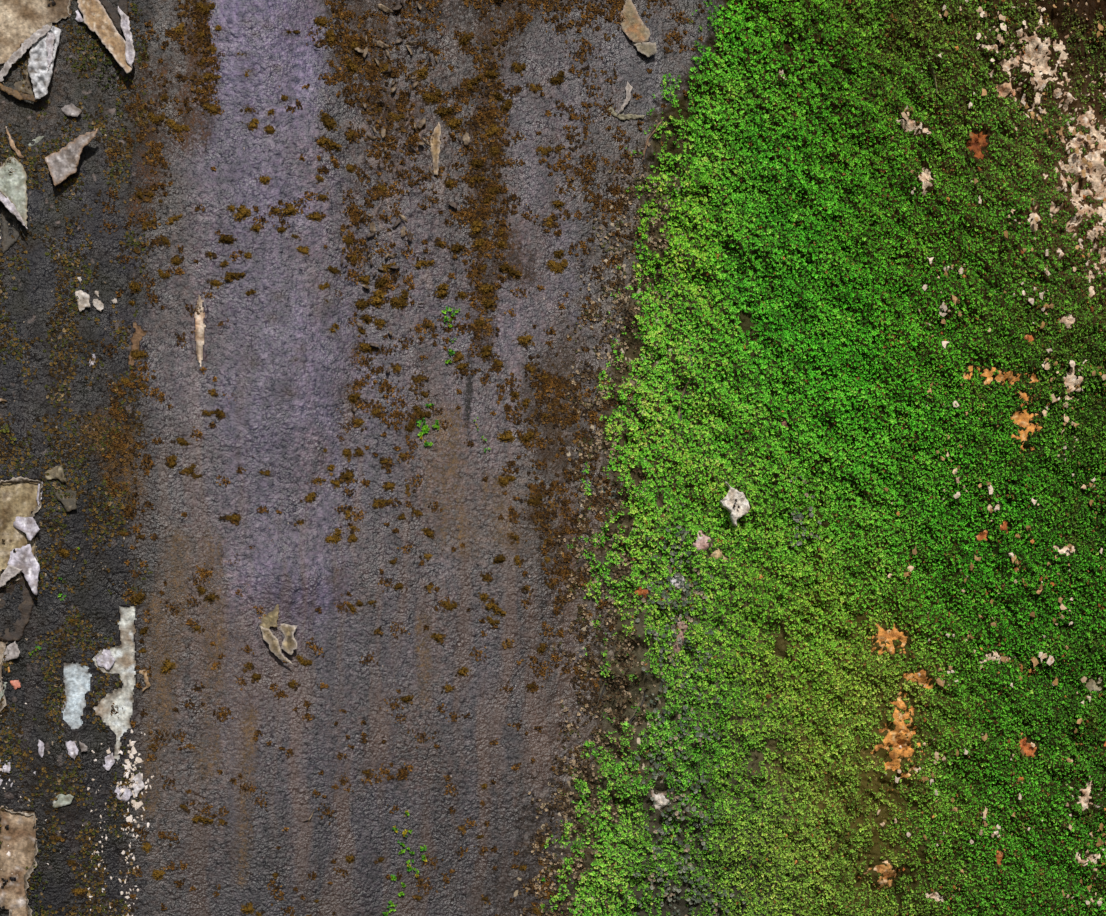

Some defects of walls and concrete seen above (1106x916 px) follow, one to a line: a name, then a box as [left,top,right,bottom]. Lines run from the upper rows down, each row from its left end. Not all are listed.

peeling [0,0,135,102]
peeling [0,126,44,254]
peeling [61,103,82,117]
peeling [45,128,98,186]
water stain [430,353,472,549]
peeling [0,465,77,712]
peeling [259,604,298,665]
peeling [58,606,151,771]
peeling [53,794,74,808]
peeling [115,772,144,802]
peeling [0,806,38,916]